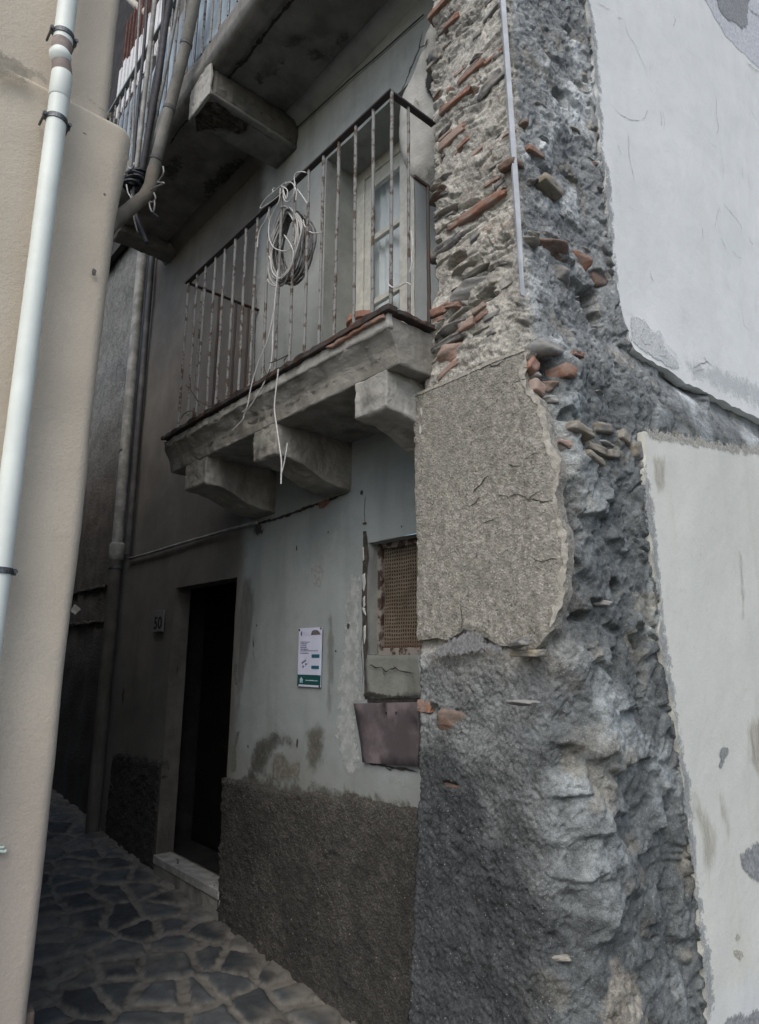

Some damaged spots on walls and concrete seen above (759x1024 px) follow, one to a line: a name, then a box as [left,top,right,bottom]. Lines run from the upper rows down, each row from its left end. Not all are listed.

crack [469,452,552,523]
spalling [407,0,759,1024]
crack [361,637,411,688]
water stain [242,729,409,809]